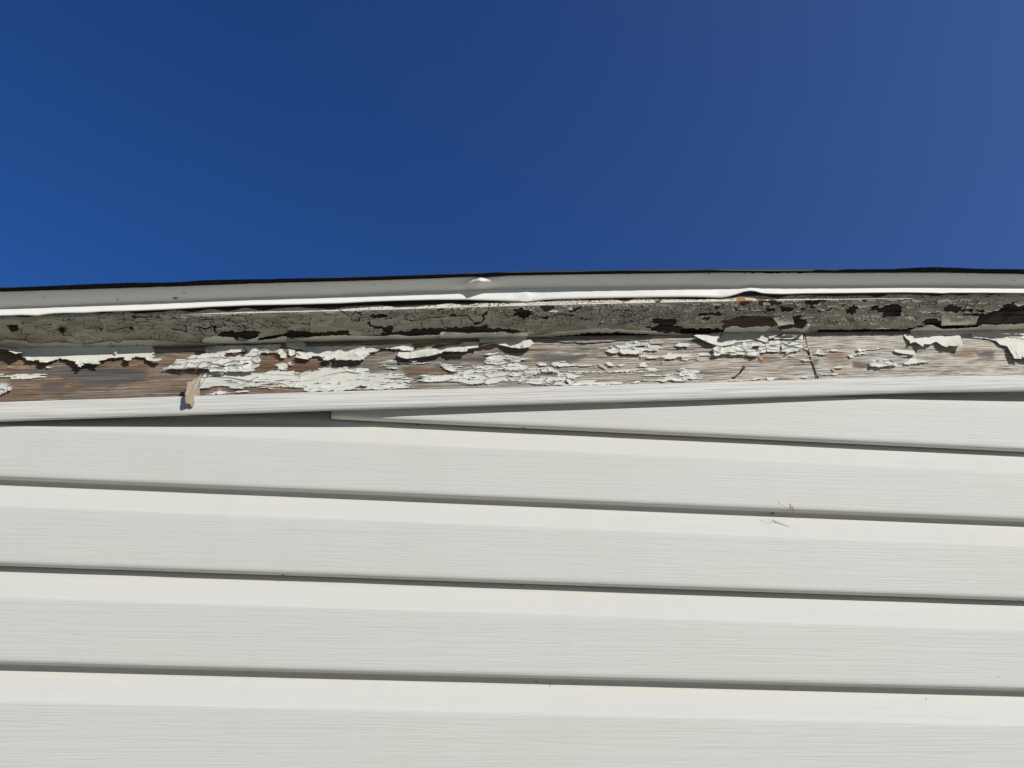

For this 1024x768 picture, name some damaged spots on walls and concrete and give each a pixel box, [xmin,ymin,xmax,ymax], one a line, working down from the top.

crack [25,312,311,344]
crack [387,308,488,326]
crack [513,304,649,328]
crack [687,303,769,314]
peeling [0,296,1024,395]